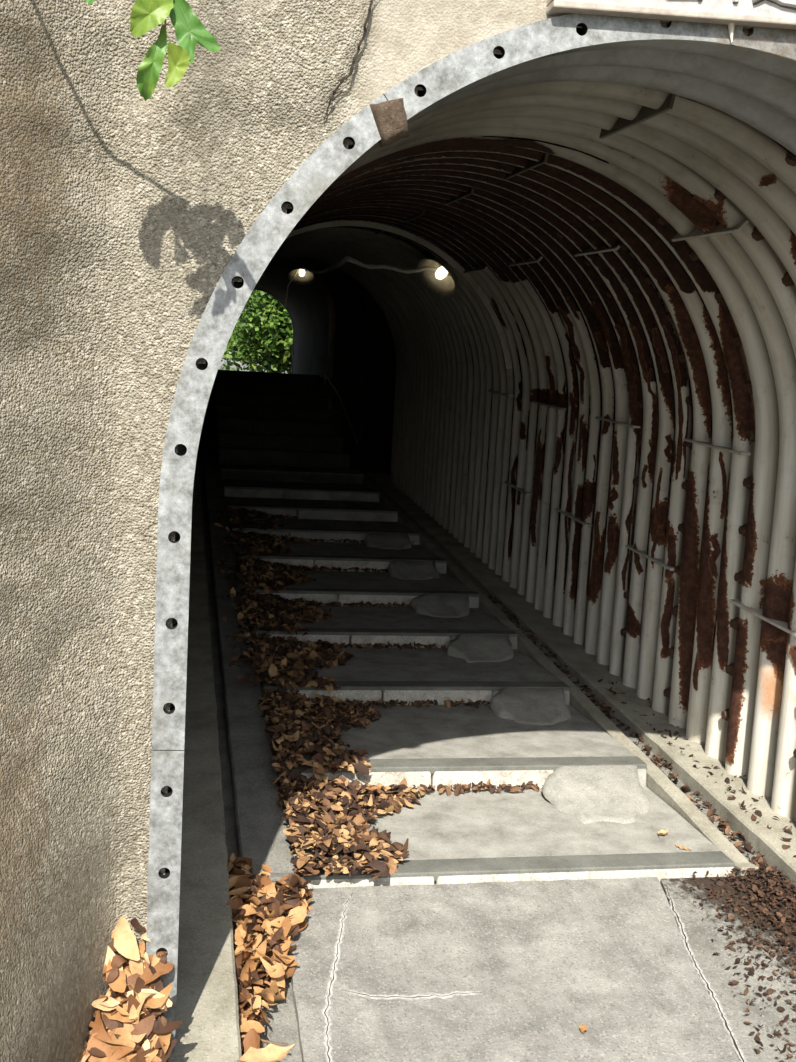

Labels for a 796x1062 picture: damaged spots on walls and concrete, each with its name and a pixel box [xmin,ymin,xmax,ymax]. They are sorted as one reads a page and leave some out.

crack [303,0,373,120]
corrosion [291,136,796,764]
crack [322,889,486,1062]